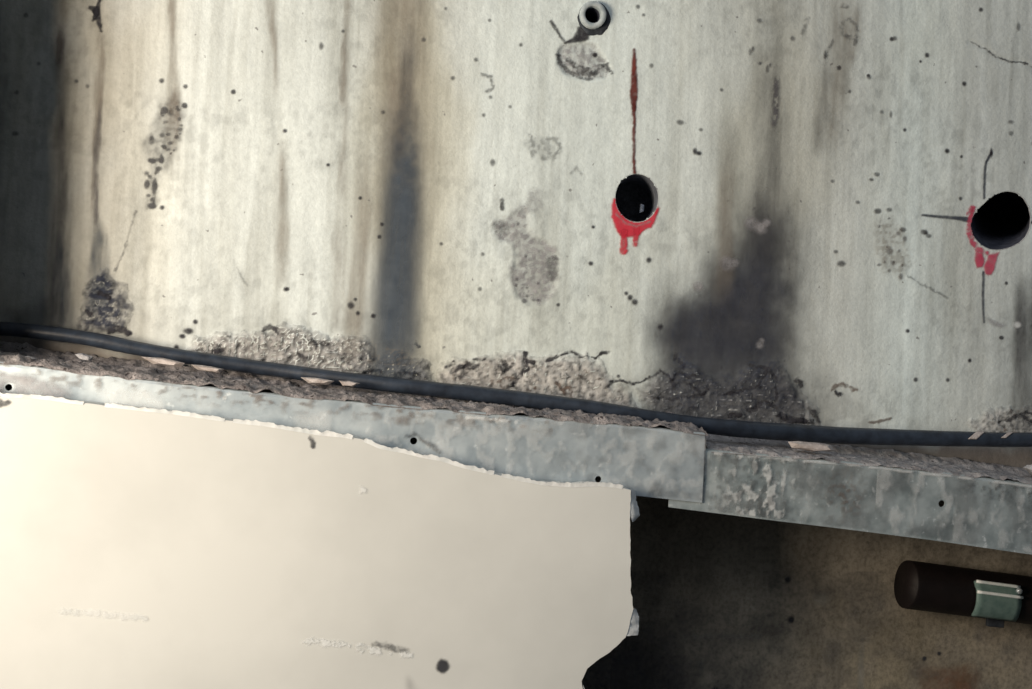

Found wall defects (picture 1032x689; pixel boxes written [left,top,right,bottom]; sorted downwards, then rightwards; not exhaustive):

water stain [375,122,418,371]
water stain [661,222,788,404]